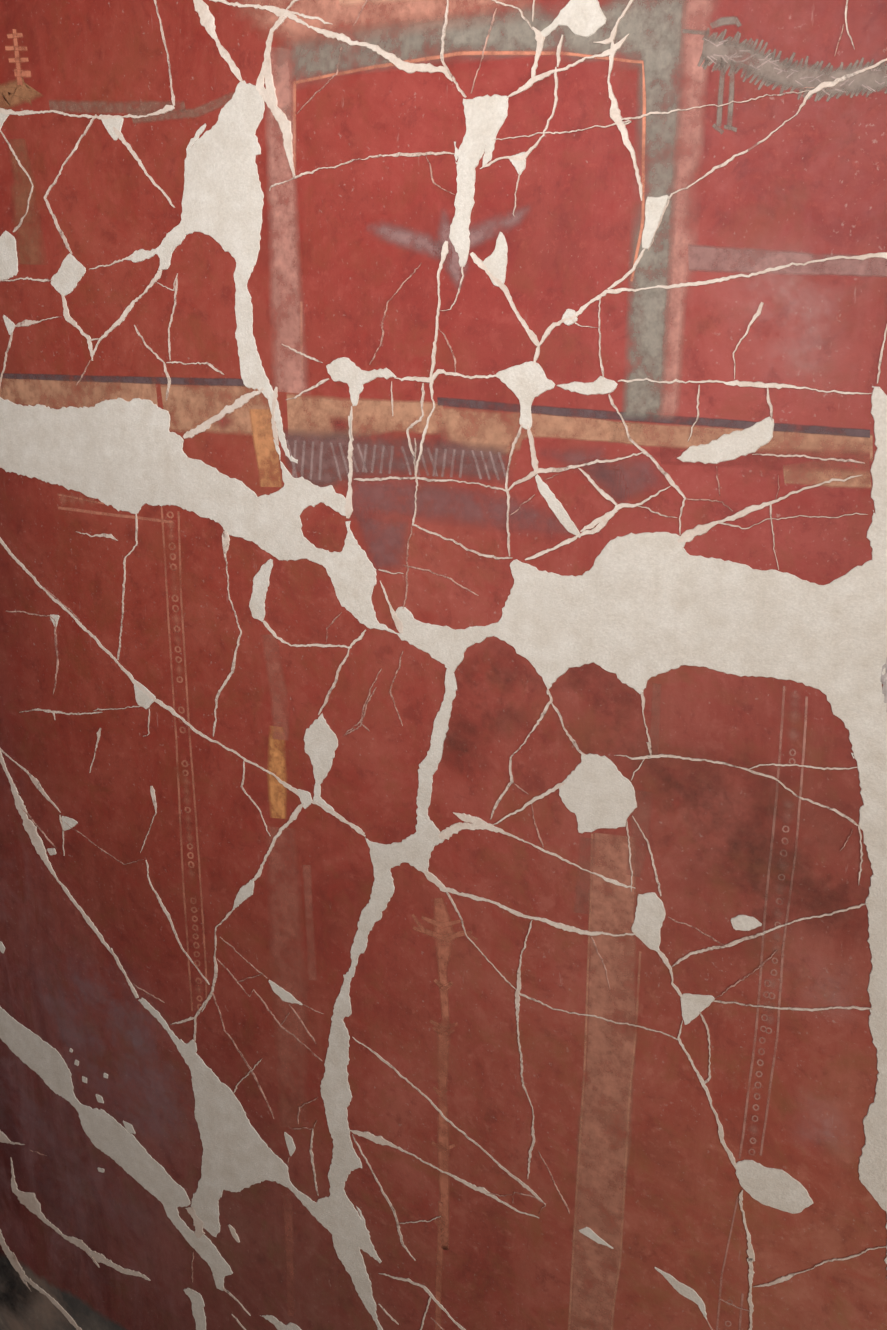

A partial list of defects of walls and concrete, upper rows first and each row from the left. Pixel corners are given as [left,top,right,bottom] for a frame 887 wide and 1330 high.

crack [0,0,175,387]
crack [164,361,225,400]
spalling [0,80,427,737]
crack [193,0,887,608]
crack [0,512,403,1061]
spalling [0,386,887,1330]
crack [0,1229,82,1330]
crack [0,1131,151,1281]
crack [284,1098,319,1196]
crack [379,1273,466,1330]
crack [349,1037,570,1218]